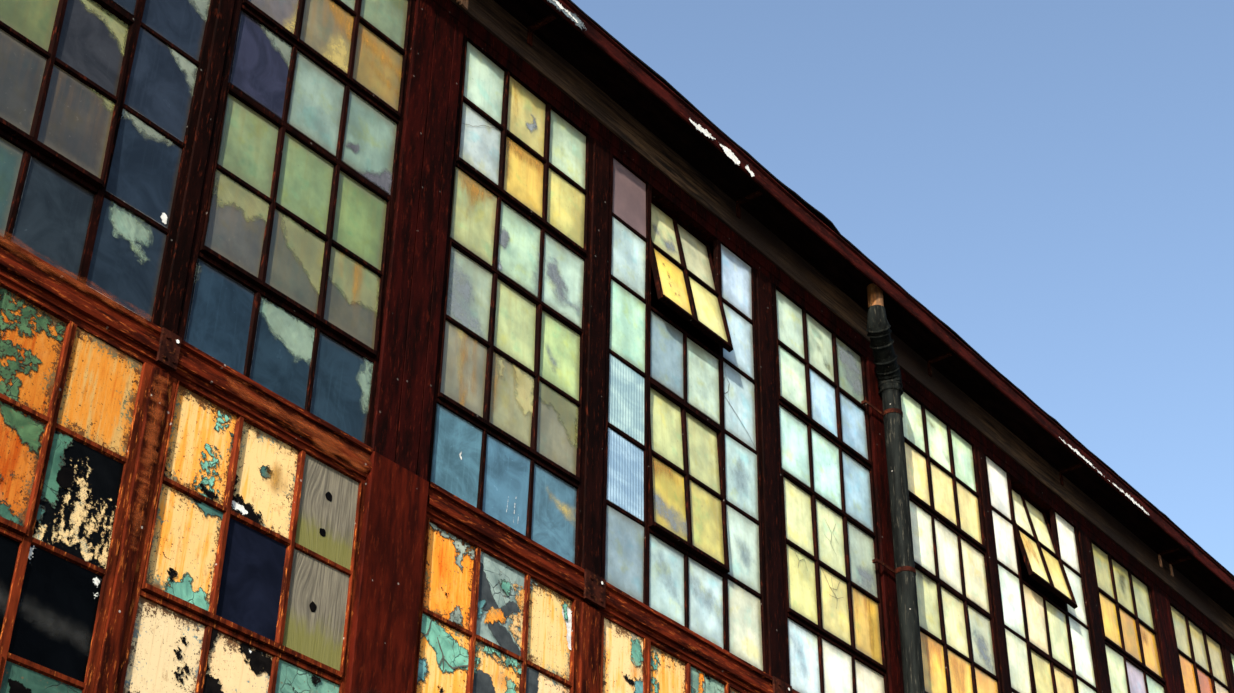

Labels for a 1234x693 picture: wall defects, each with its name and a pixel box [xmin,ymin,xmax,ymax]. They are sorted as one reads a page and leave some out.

peeling [0,286,117,599]
peeling [187,410,264,524]
peeling [258,465,279,488]
peeling [163,567,210,611]
peeling [417,522,539,693]
peeling [560,601,572,650]
peeling [8,678,31,693]
peeling [172,628,272,693]
peeling [623,638,661,693]
peeling [691,670,715,693]